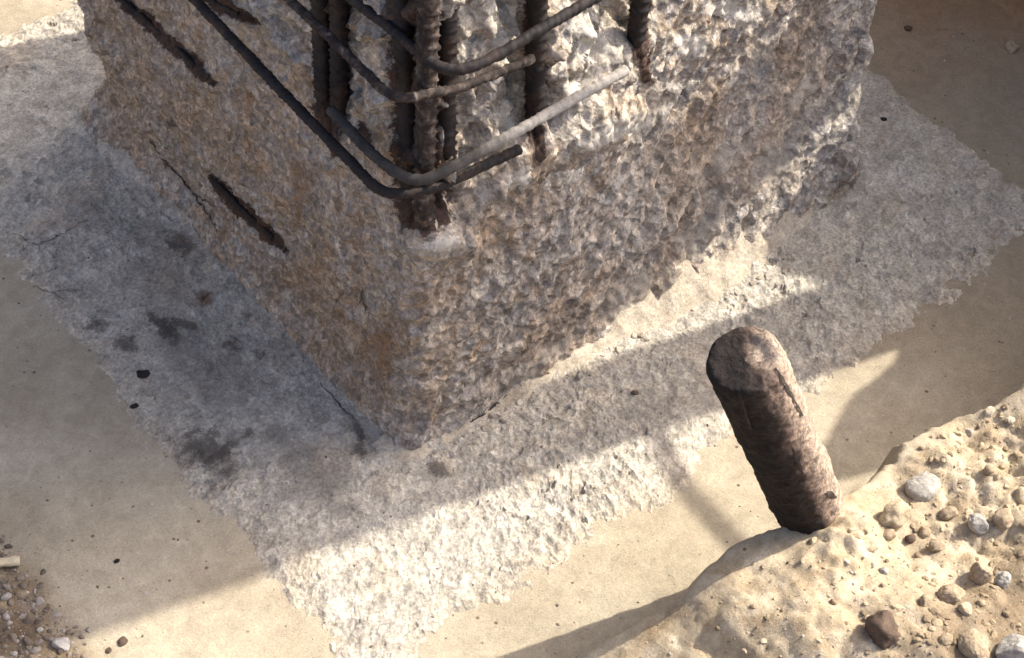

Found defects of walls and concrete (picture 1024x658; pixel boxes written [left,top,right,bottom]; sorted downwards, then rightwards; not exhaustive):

spalling [115,0,217,87]
spalling [562,14,618,110]
rust [629,1,654,84]
spalling [660,0,771,61]
spalling [380,0,471,253]
rust [526,122,547,163]
spalling [504,79,703,192]
crack [150,141,218,232]
spalling [208,174,289,254]
damp [147,312,198,345]
crack [320,382,361,423]
damp [167,428,253,487]